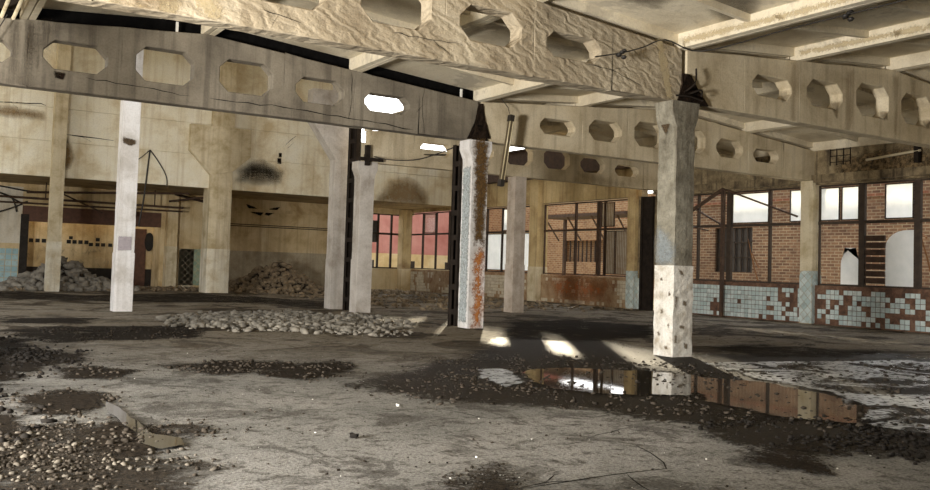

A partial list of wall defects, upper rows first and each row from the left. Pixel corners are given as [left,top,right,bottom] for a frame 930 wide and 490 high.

corrosion [470,249,485,329]